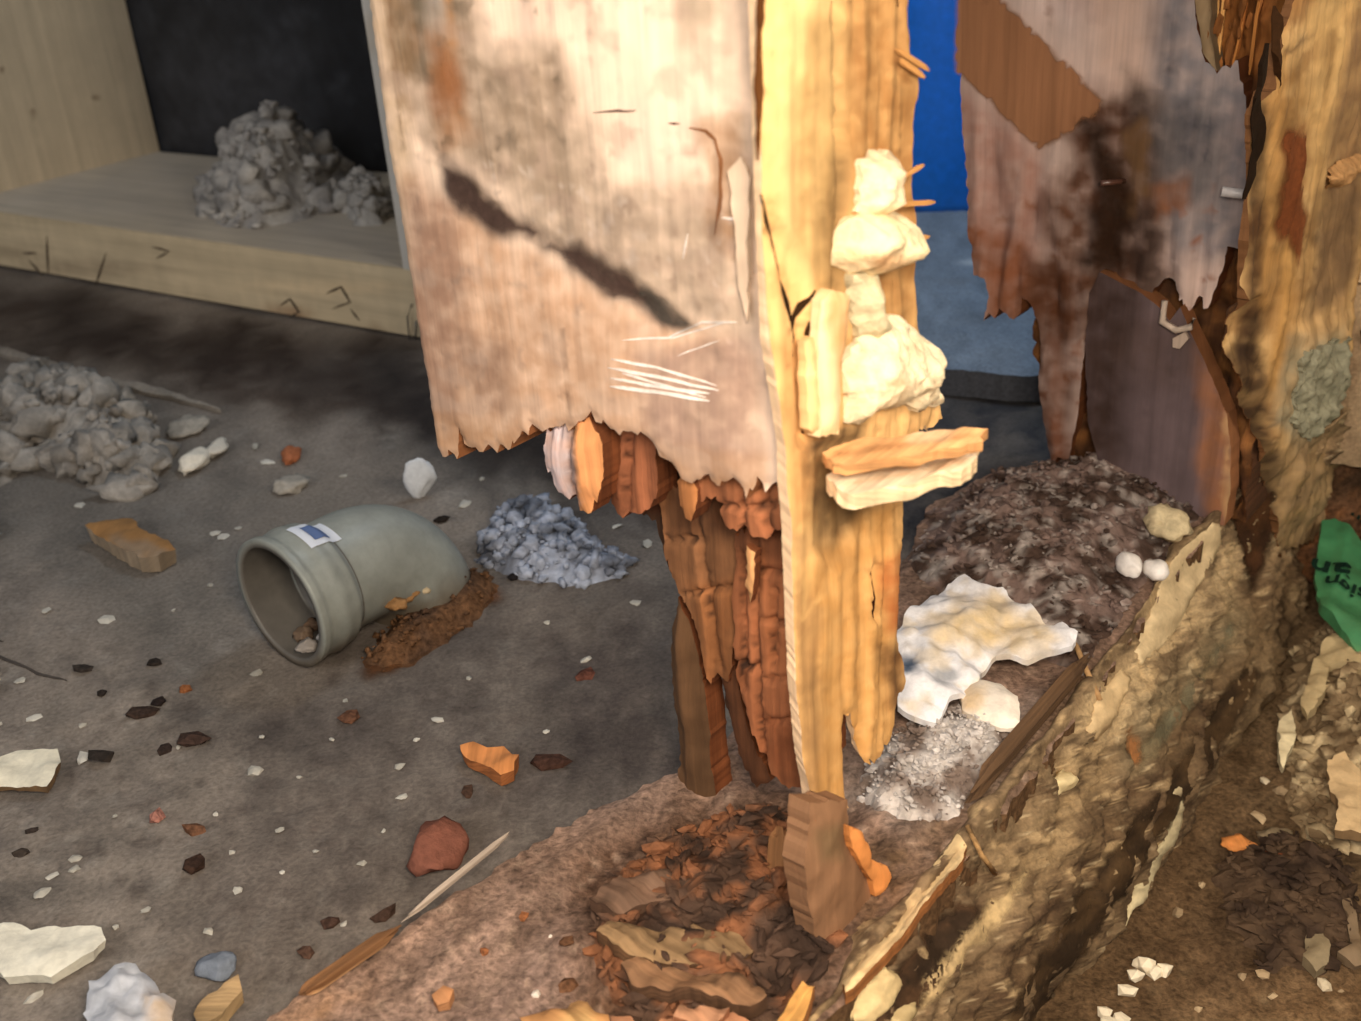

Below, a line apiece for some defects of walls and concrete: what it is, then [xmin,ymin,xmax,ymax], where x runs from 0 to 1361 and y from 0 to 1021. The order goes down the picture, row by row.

leakage [443,167,691,328]
crack [594,107,636,115]
crack [668,122,723,235]
crack [754,0,765,160]
crack [760,194,816,357]
leakage [955,0,1128,271]
crack [0,640,67,681]